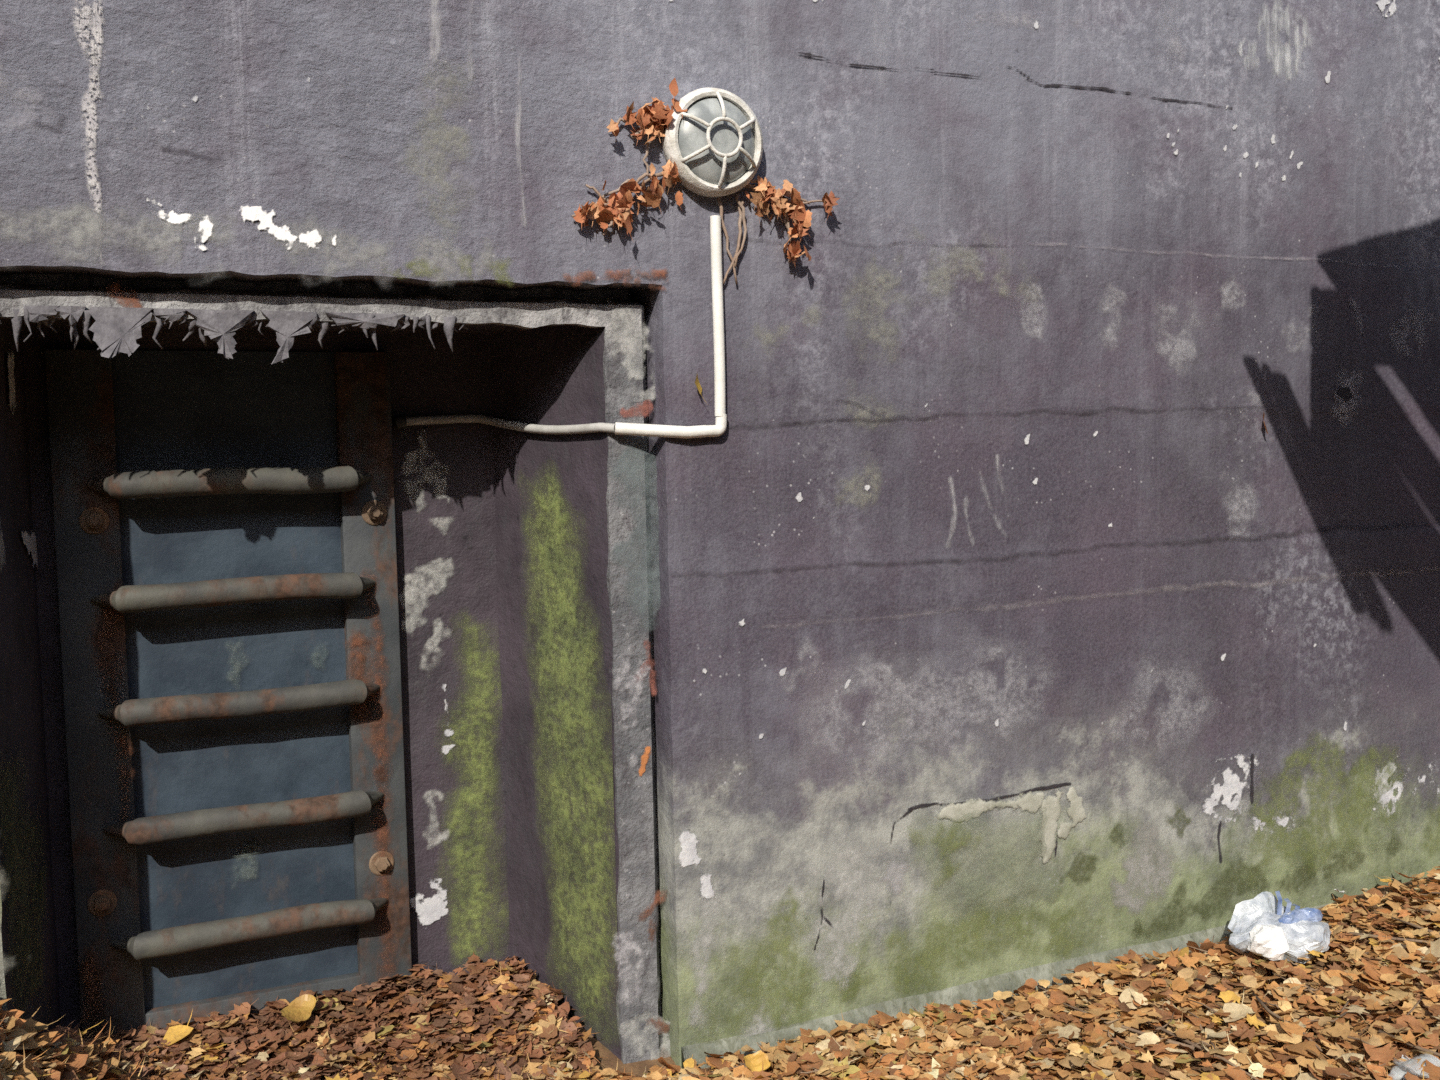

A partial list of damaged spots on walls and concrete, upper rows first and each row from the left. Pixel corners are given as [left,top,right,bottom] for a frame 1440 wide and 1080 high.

crack [798,52,1233,109]
damp [48,0,214,250]
peeling [147,198,213,251]
peeling [239,206,336,250]
peeling [24,305,405,364]
peeling [400,558,452,661]
corrosion [350,621,389,948]
damp [1203,754,1289,832]
damp [1373,756,1440,817]
peeling [410,878,448,925]
damp [679,831,719,1023]
damp [809,834,907,983]